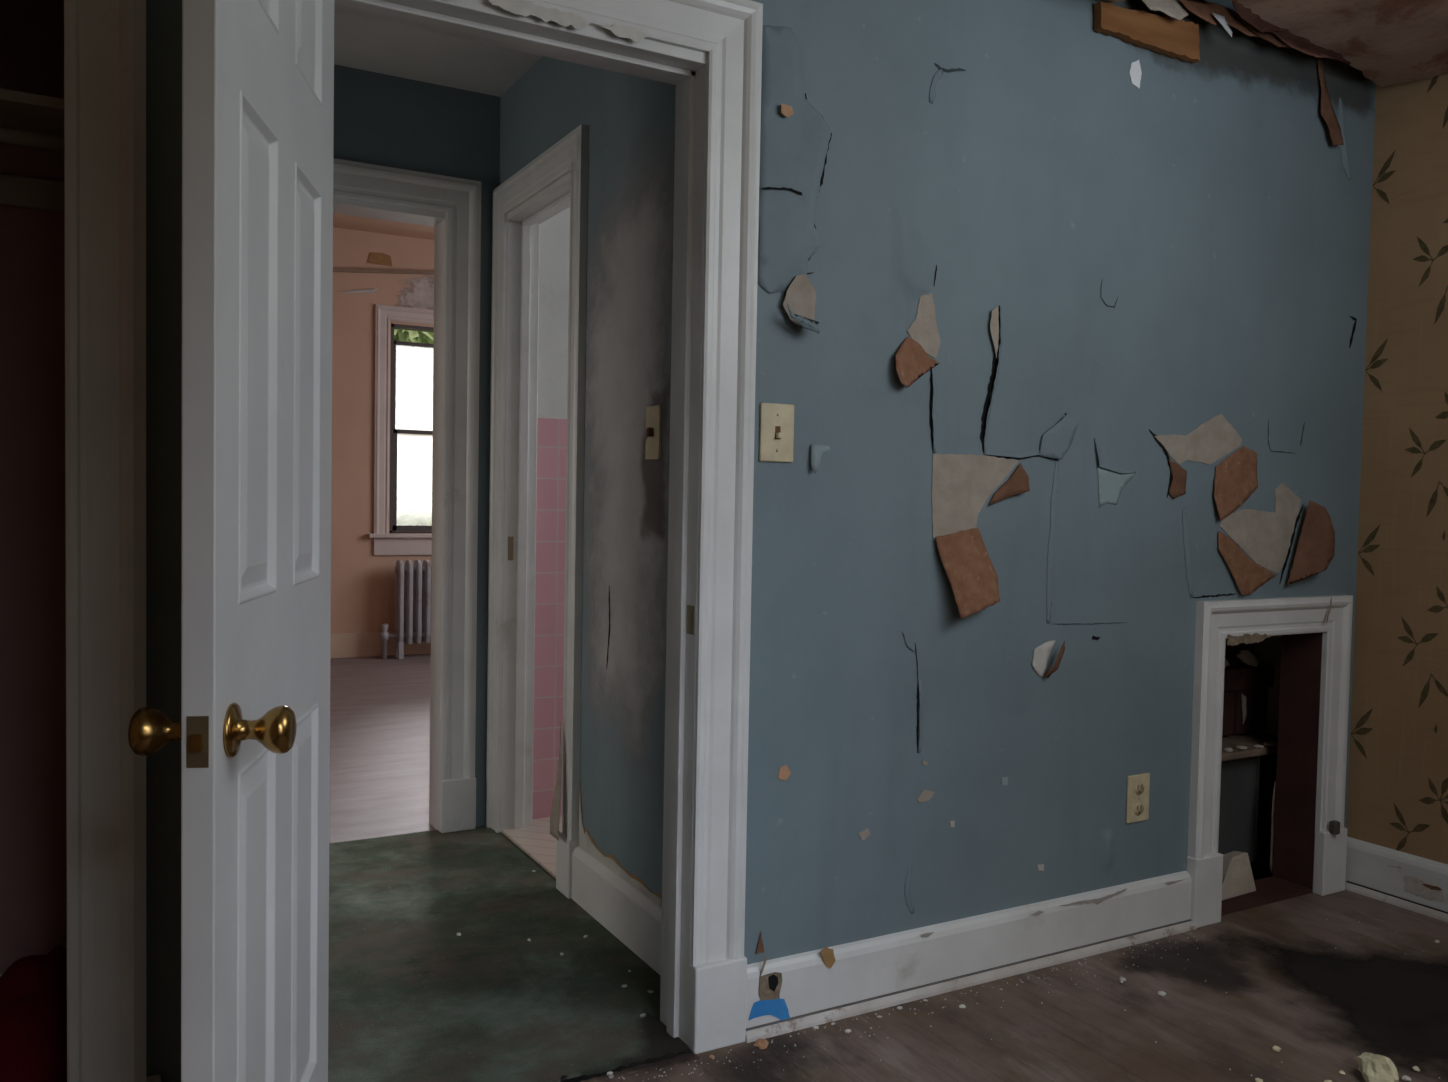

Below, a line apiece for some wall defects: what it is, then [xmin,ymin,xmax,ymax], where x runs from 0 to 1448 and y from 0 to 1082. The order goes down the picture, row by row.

peeling [1129,60,1142,89]
peeling [907,292,940,359]
crack [929,367,937,453]
peeling [931,454,1019,537]
crack [980,305,1059,461]
crack [1094,438,1136,474]
peeling [1155,413,1242,465]
peeling [1219,483,1301,573]
crack [902,632,923,753]
peeling [1032,640,1056,677]
leakage [1130,938,1448,1078]